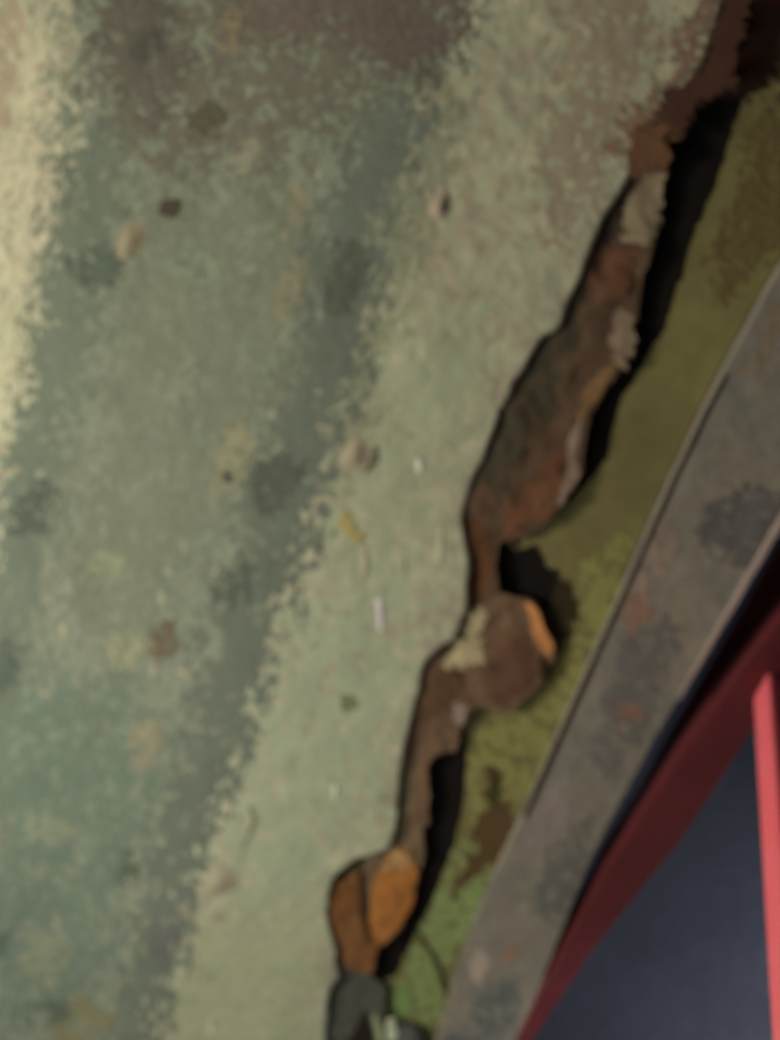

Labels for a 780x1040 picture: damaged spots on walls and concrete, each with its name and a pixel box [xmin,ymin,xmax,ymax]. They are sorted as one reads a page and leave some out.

corrosion [576,363,617,418]
water stain [0,0,507,1040]
corrosion [465,513,495,605]
spalling [317,166,667,1040]
corrosion [368,847,419,945]